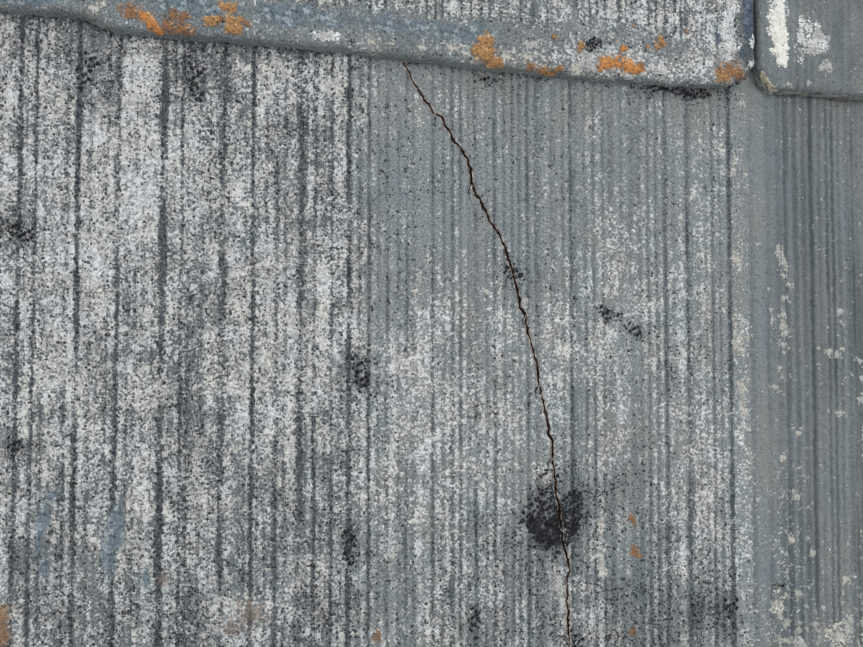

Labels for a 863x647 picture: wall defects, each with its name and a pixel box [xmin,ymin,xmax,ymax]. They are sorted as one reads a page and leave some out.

crack [402,61,583,647]